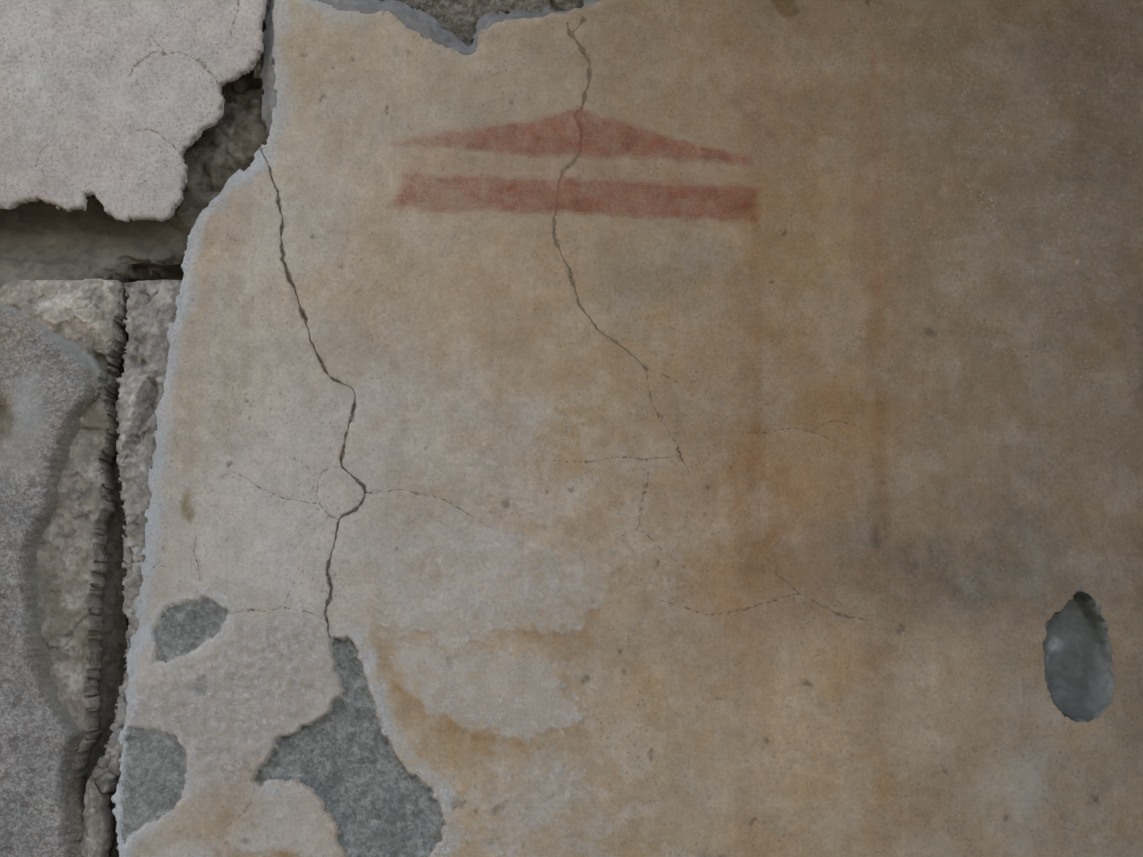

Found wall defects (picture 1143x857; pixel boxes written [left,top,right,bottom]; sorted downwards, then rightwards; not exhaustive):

crack [113,263,183,283]
crack [550,0,689,550]
crack [236,148,469,638]
crack [85,328,164,857]
flaking render [121,727,187,844]
flaking render [153,597,229,663]
flaking render [254,627,463,857]